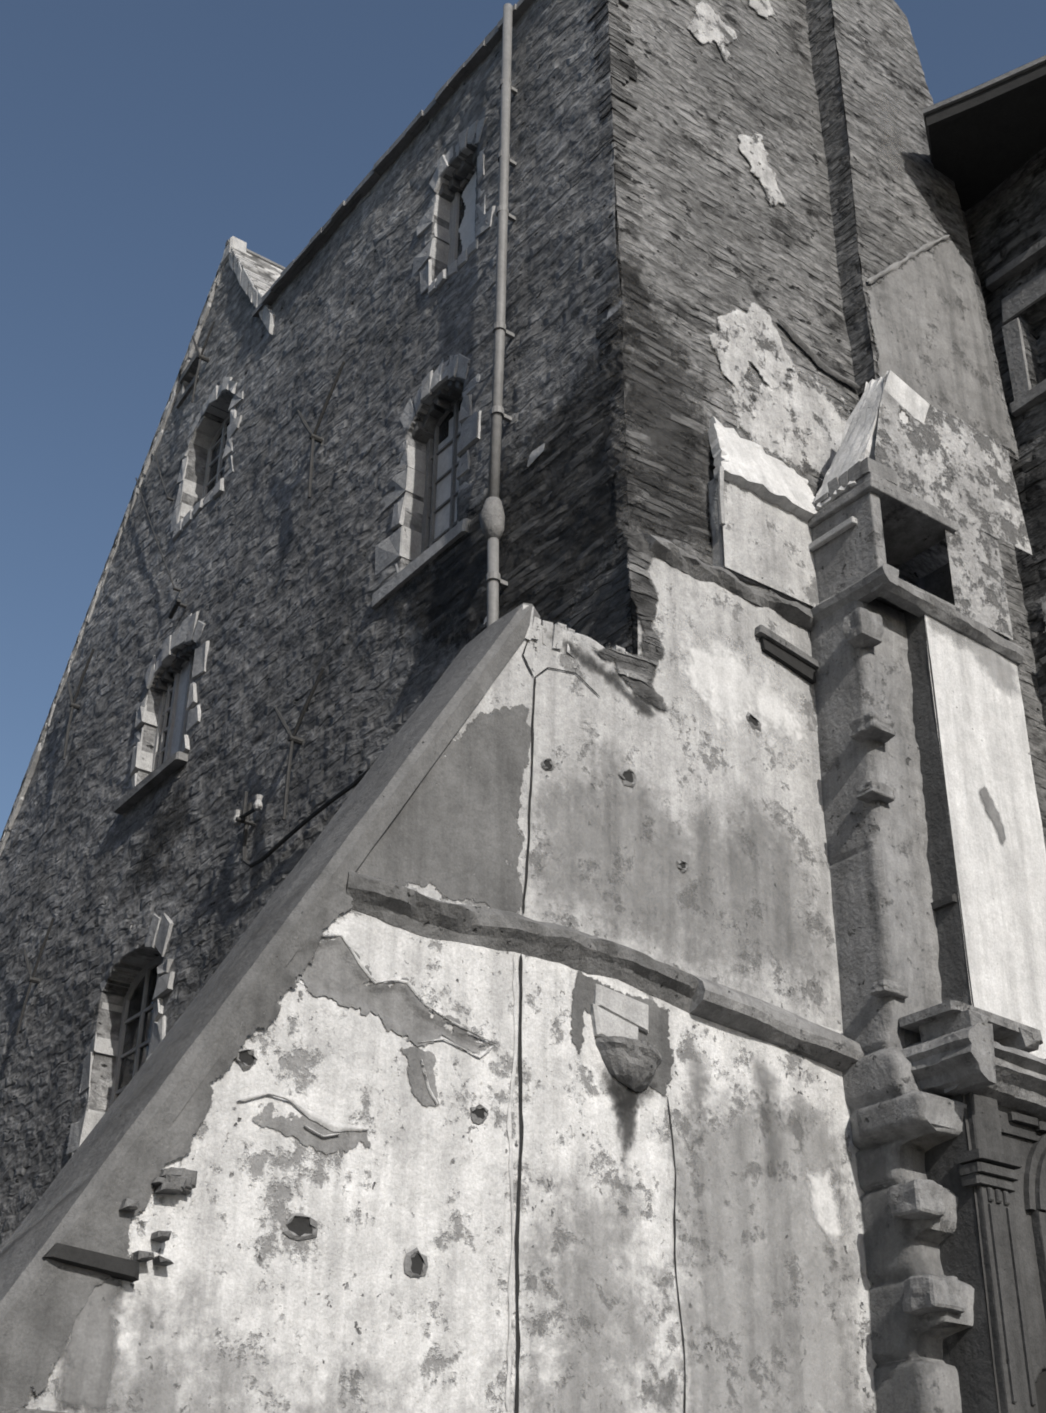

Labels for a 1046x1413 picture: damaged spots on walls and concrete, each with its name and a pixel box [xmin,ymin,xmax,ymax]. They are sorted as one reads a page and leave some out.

flaking render [565,524,668,711]
damp [355,704,532,913]
crack [522,640,600,914]
flaking render [0,1264,111,1408]
flaking render [75,885,497,1260]
crack [505,952,524,1413]
damp [617,1091,637,1151]
crack [667,1097,686,1413]
damp [807,1170,843,1240]